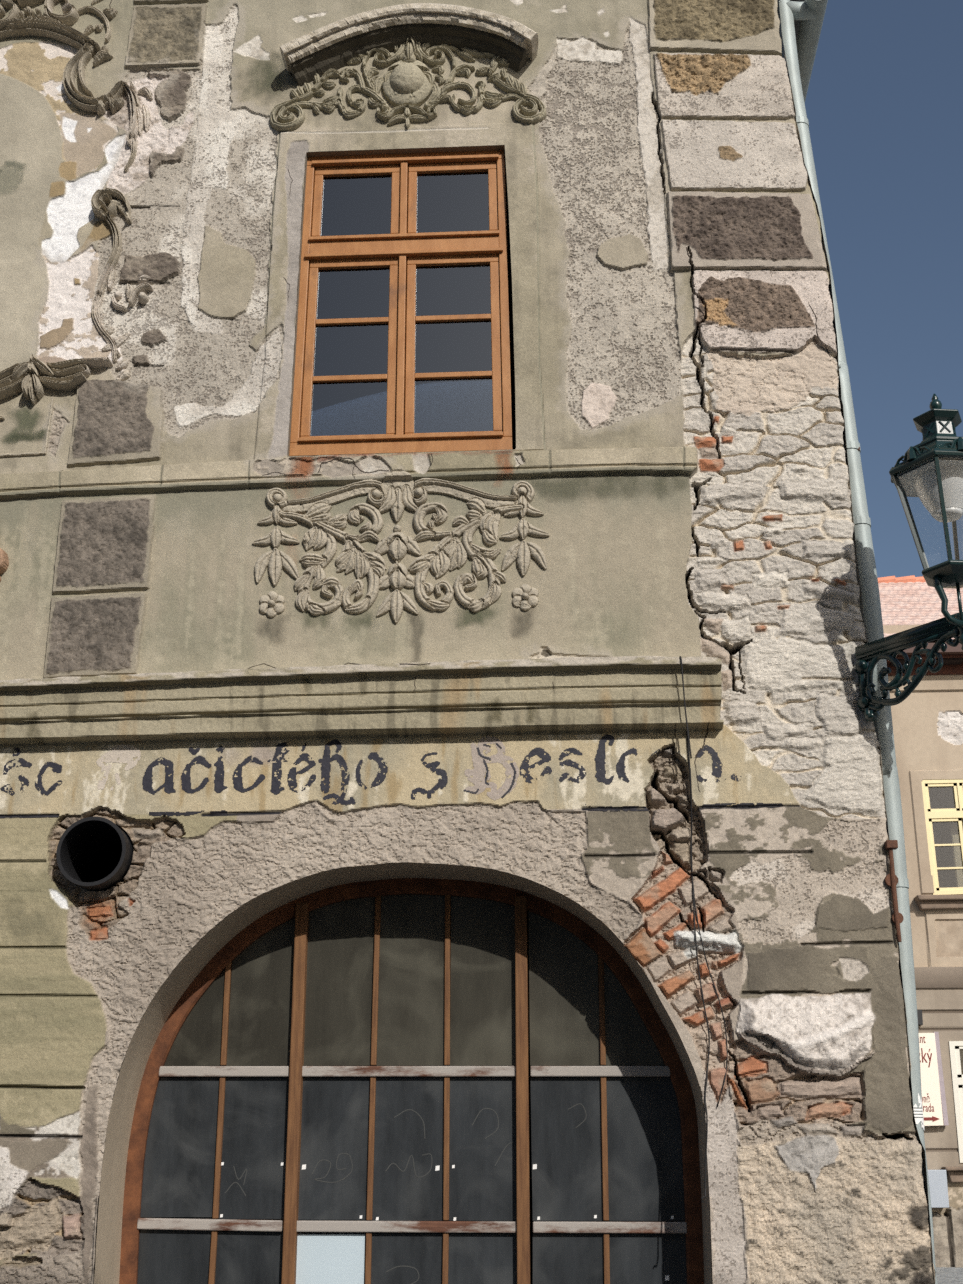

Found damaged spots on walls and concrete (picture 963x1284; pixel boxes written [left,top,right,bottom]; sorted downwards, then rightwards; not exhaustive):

flaking render [293,12,327,23]
flaking render [0,4,285,437]
crack [652,93,666,195]
crack [685,245,753,694]
flaking render [528,17,918,1145]
spalling [49,806,185,941]
crack [651,723,720,932]
crack [728,1050,753,1112]
flaking render [0,1109,85,1268]
leakage [912,1274,931,1284]